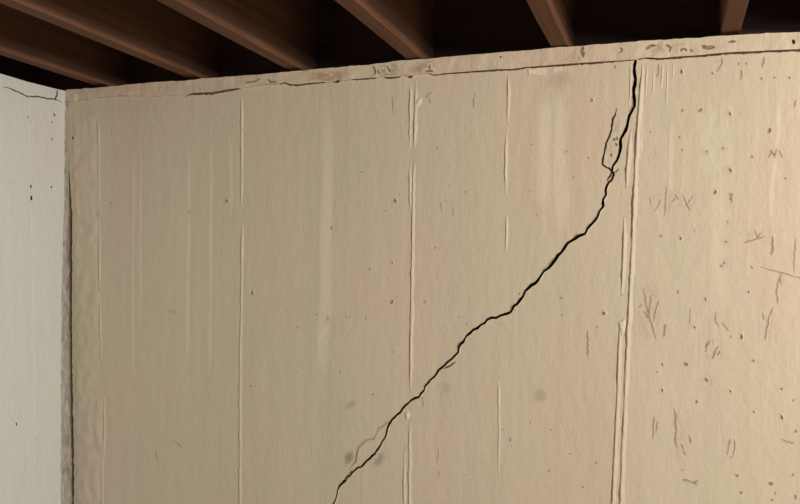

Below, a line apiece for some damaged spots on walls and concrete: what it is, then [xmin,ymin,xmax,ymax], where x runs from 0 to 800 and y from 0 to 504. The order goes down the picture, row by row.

crack [5,87,62,103]
crack [186,89,238,97]
crack [280,50,800,504]